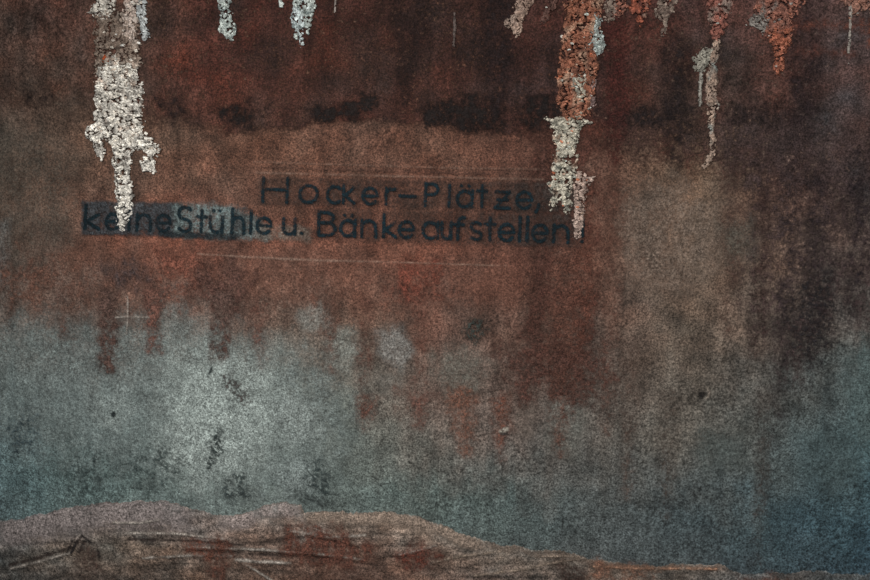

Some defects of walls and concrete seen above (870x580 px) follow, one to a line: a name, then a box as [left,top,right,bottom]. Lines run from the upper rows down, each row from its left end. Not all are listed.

damp [0,0,870,370]
damp [223,375,251,405]